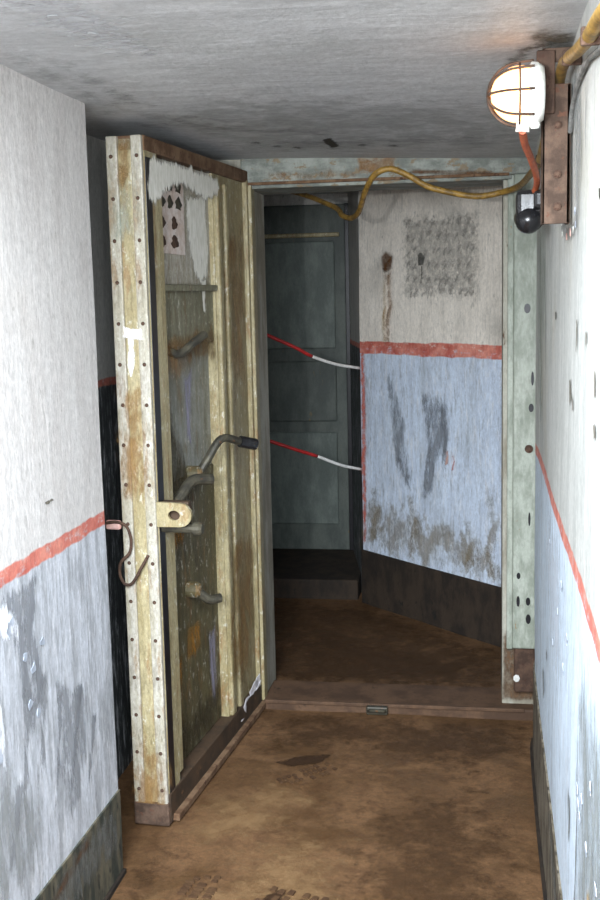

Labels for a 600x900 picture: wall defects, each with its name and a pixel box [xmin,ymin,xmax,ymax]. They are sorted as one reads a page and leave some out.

rust [382,253,392,282]
rust [124,390,146,495]
damp [389,384,409,484]
damp [423,396,448,492]
damp [0,782,40,900]
damp [56,685,96,816]
damp [568,702,600,900]